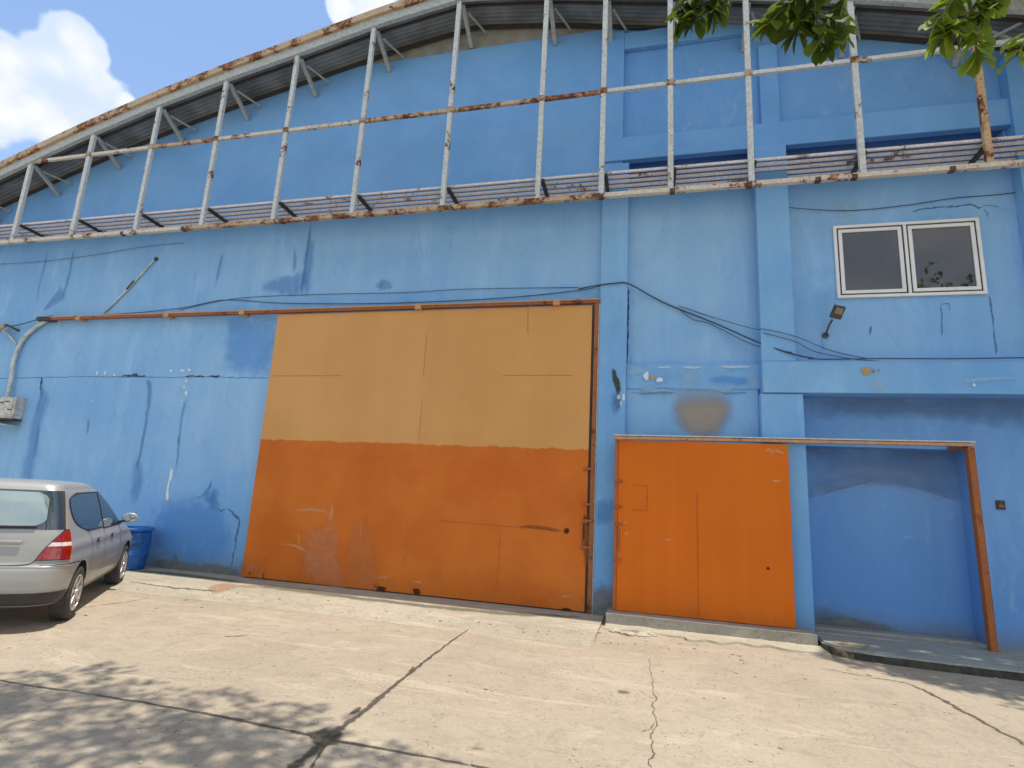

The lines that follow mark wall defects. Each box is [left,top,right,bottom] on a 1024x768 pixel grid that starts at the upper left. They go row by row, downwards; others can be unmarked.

flaking render [612,369,625,408]
leakage [159,556,234,575]
crack [642,661,658,767]
crack [829,669,1023,744]